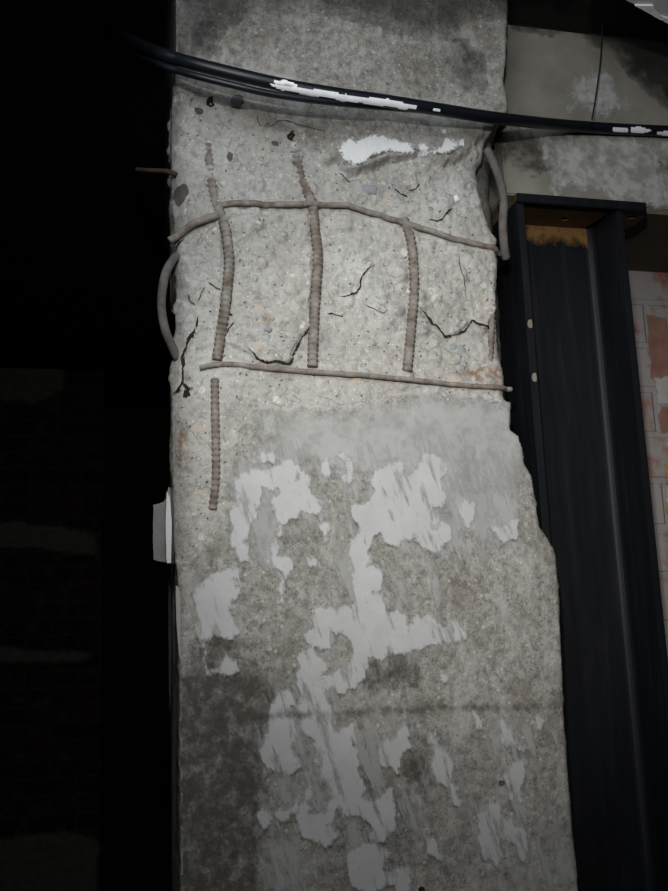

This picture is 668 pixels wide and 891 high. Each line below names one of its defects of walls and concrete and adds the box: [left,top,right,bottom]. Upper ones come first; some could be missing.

peeling [634,4,668,23]
leakage [495,131,552,170]
crack [171,239,234,394]
crack [248,328,309,365]
crack [328,266,387,317]
crack [420,305,498,337]
flaking render [647,315,668,446]
spalling [157,93,576,891]